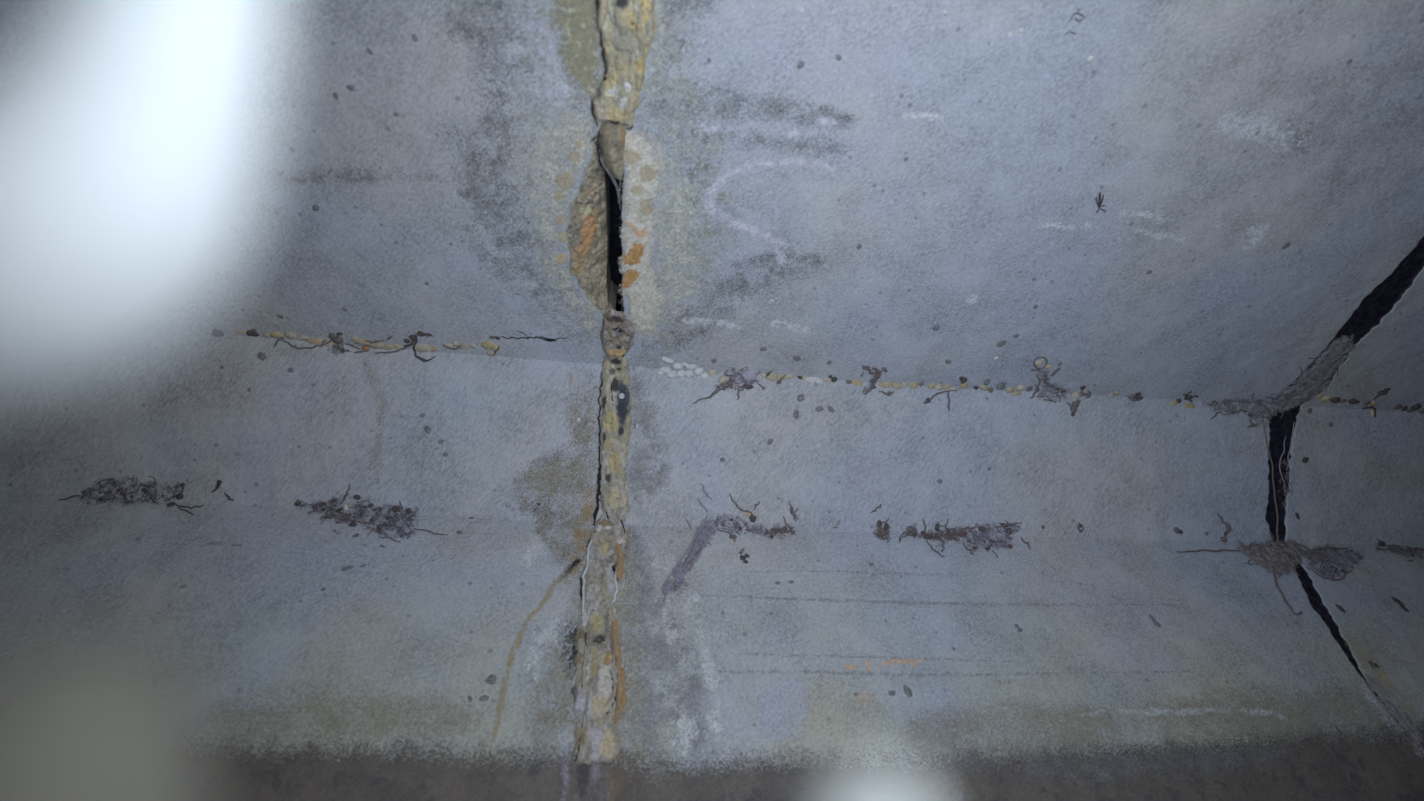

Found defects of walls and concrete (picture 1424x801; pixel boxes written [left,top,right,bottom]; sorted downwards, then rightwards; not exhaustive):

crack [590,131,611,177]
water stain [427,0,855,355]
rust [621,222,647,289]
crack [502,331,568,342]
rust [492,483,601,741]
water stain [203,354,1424,801]
rust [603,620,628,724]